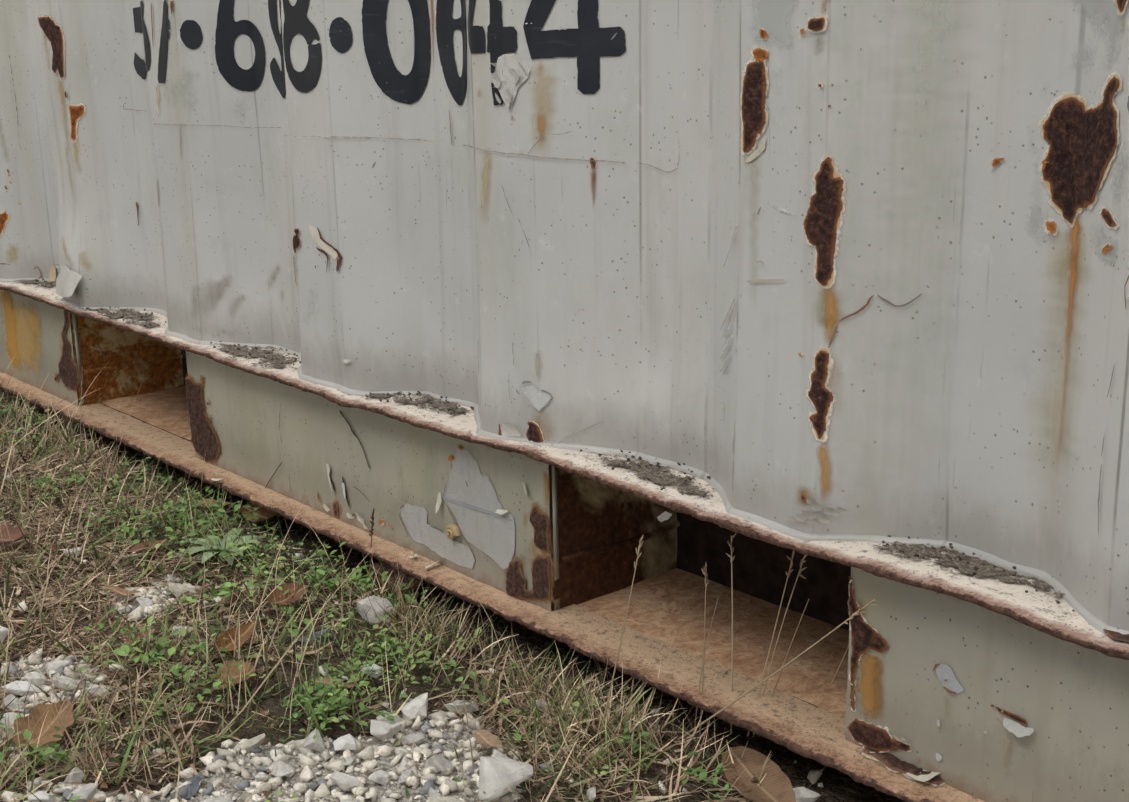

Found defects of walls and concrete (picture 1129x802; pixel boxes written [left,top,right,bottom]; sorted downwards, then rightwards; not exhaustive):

rust [1113,0,1129,16]
rust [38,15,86,156]
rust [740,28,770,163]
rust [1039,72,1122,339]
rust [799,156,846,493]
rust [186,376,221,462]
peeling [379,445,515,570]
rust [505,474,553,603]
rust [847,576,945,785]
peeling [933,663,964,694]
peeling [991,705,1034,737]